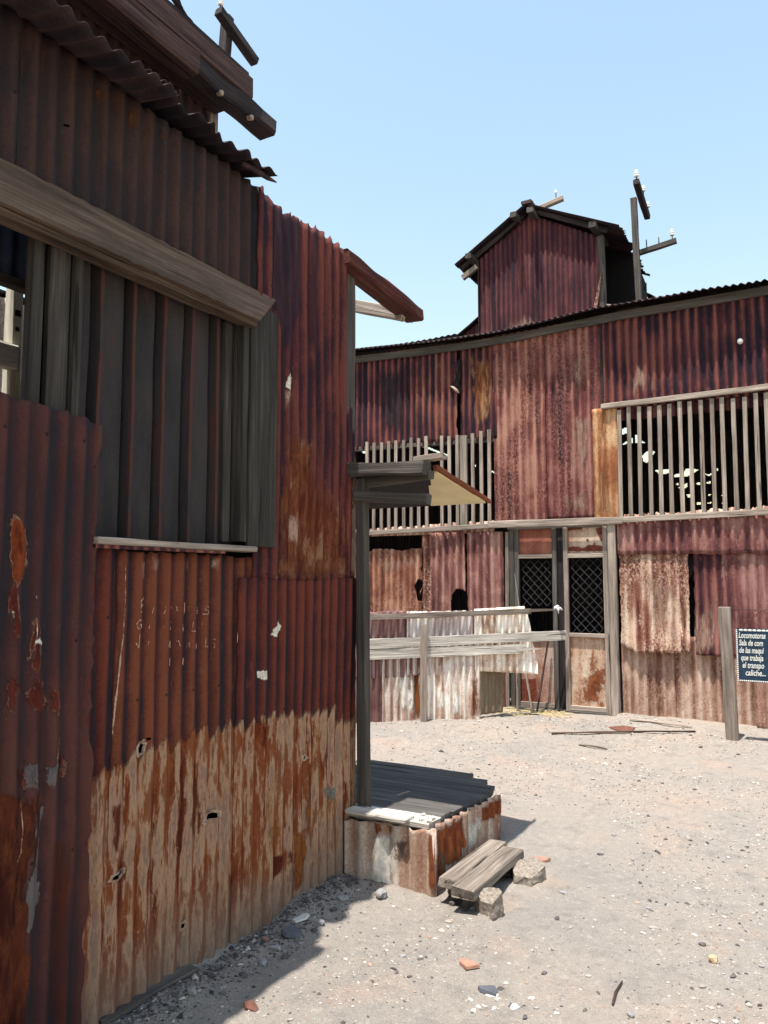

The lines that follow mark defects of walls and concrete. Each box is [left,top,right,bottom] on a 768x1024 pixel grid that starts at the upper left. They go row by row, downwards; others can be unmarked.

rust [469,358,491,424]
rust [276,433,356,579]
rust [472,678,480,715]
rust [583,650,606,707]
rust [81,704,356,1024]
rust [375,823,407,861]
rust [428,817,467,888]
rust [482,798,501,821]
rust [0,792,44,1024]